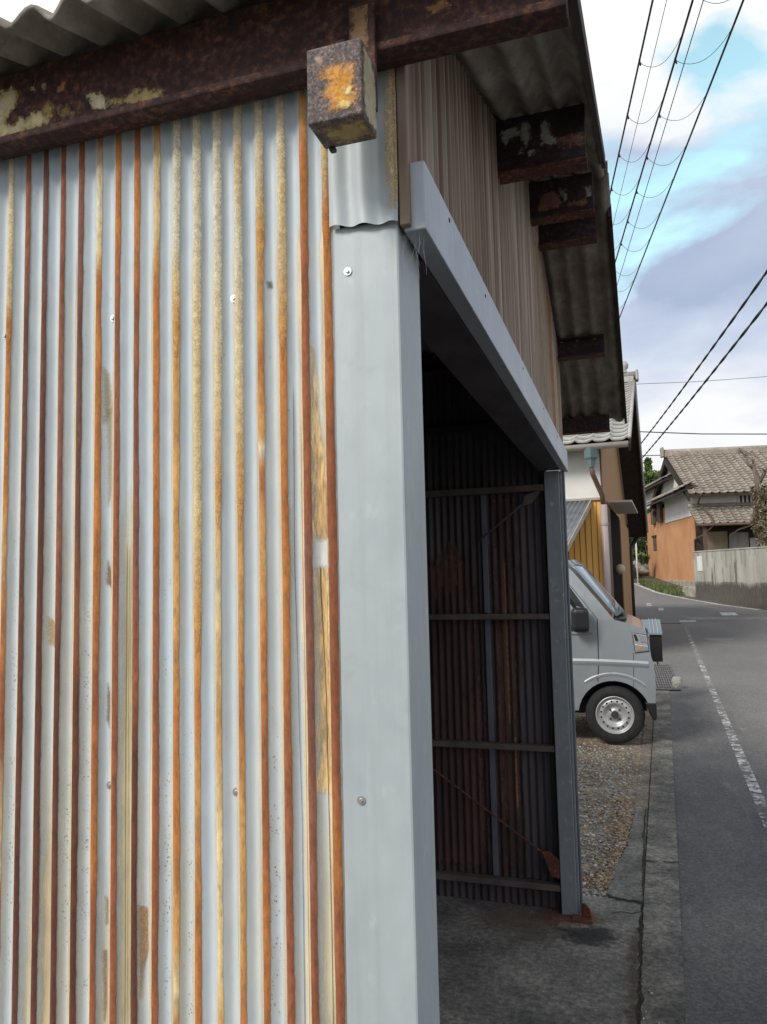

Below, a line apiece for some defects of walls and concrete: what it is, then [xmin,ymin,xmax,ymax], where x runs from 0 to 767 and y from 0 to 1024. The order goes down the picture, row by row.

rust [349,4,369,47]
peeling [0,81,73,136]
peeling [86,88,162,109]
rust [317,62,358,113]
rust [384,68,397,206]
peeling [500,121,584,156]
rust [0,90,345,1024]